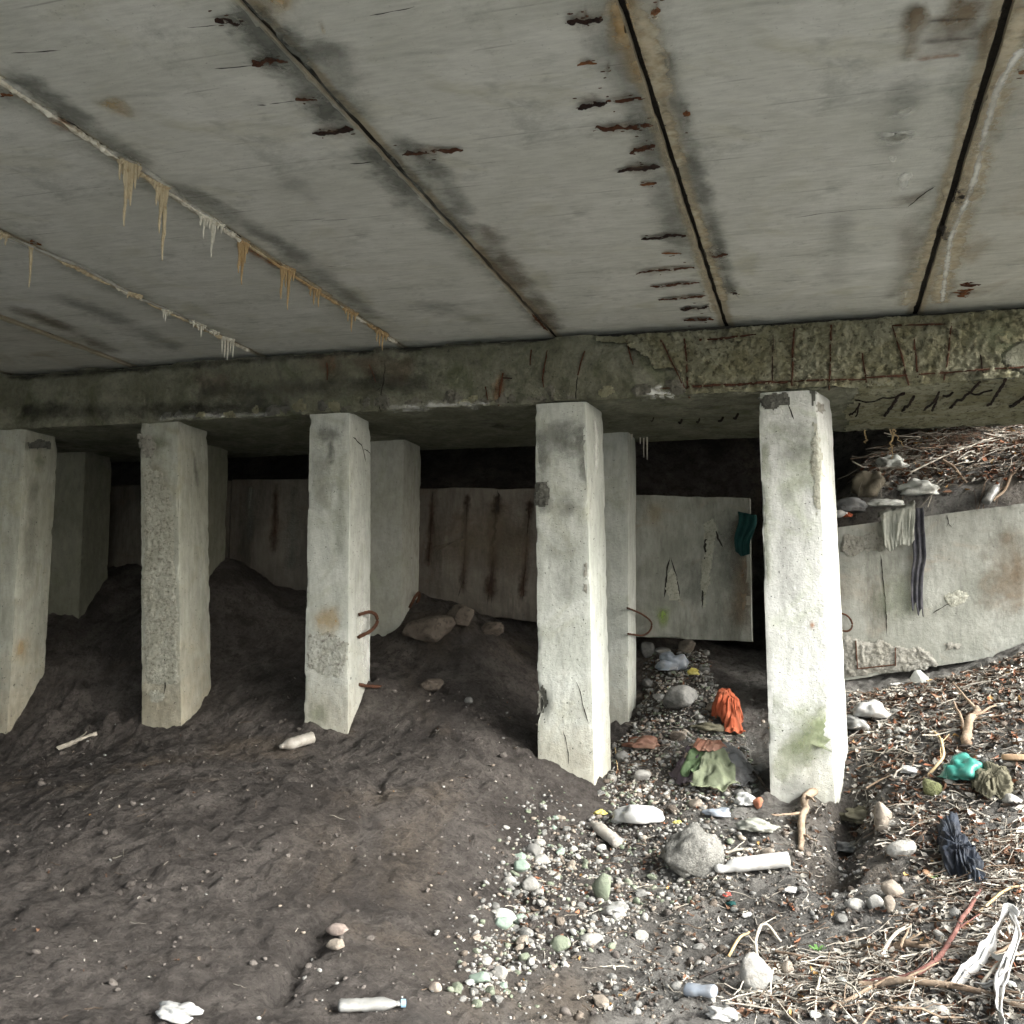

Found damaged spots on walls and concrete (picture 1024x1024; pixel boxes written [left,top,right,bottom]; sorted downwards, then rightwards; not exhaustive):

rust [565,11,603,26]
damp [235,6,351,124]
rust [312,125,355,138]
rust [394,145,463,160]
rust [573,60,661,187]
damp [902,7,1024,305]
damp [0,76,513,363]
rust [636,252,714,323]
damp [9,366,159,380]
spalling [595,308,1024,515]
crack [664,519,723,608]
spalling [842,635,938,678]